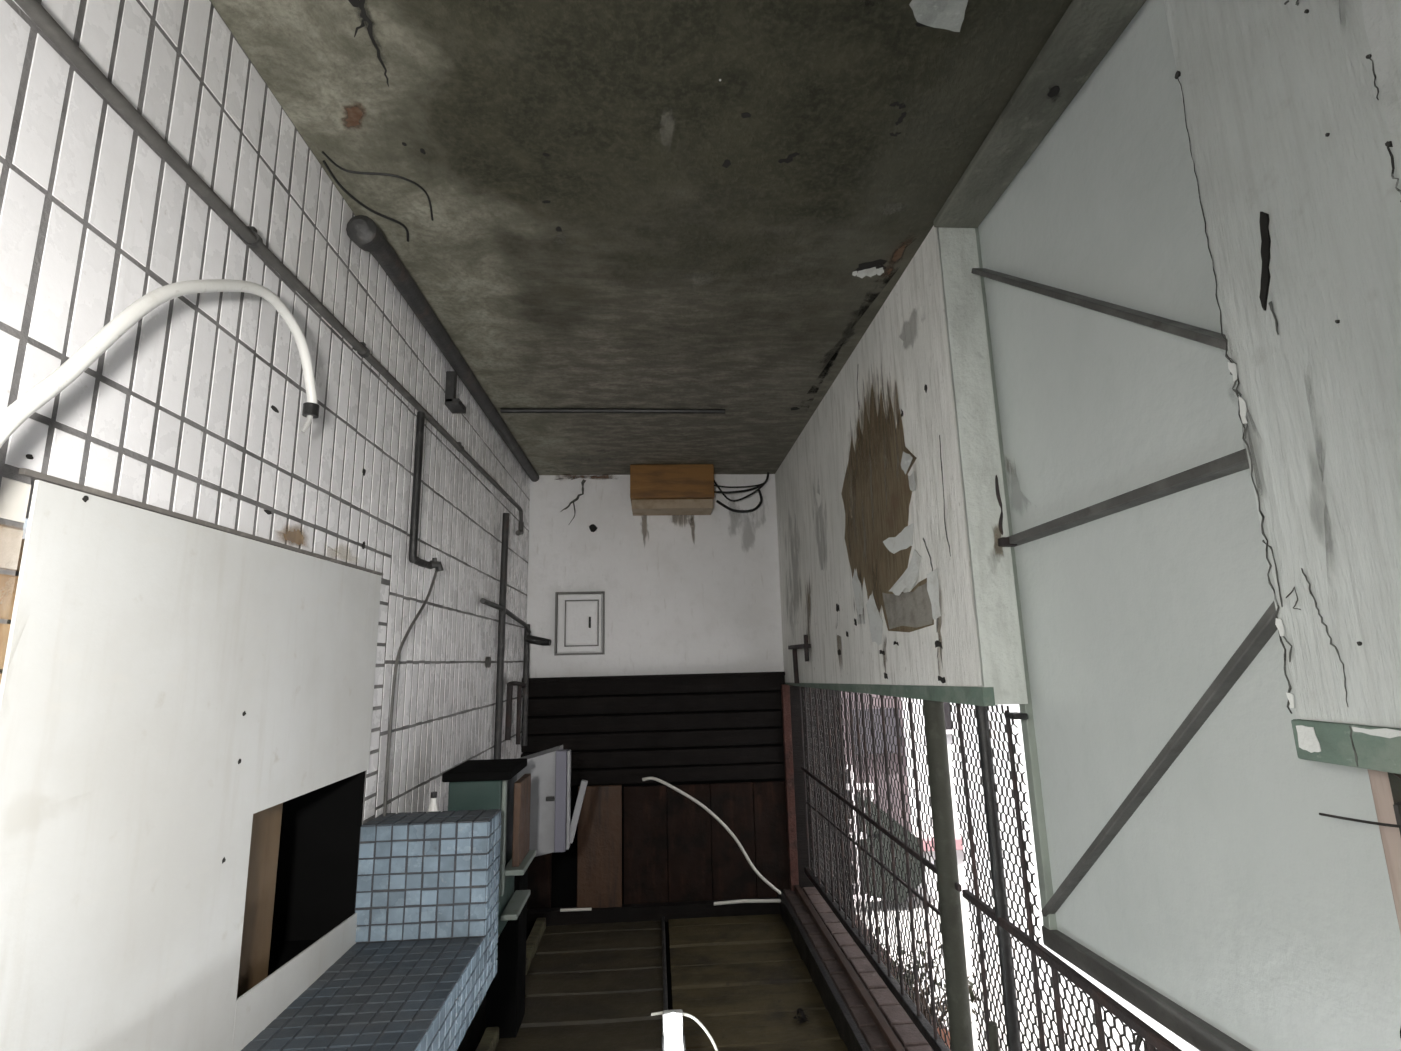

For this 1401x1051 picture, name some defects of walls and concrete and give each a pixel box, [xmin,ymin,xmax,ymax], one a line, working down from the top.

crack [348,0,389,87]
rust [342,103,365,128]
crack [1177,70,1358,767]
crack [560,479,586,524]
peeling [841,373,941,645]
peeling [1296,725,1321,753]
peeling [1352,727,1401,738]